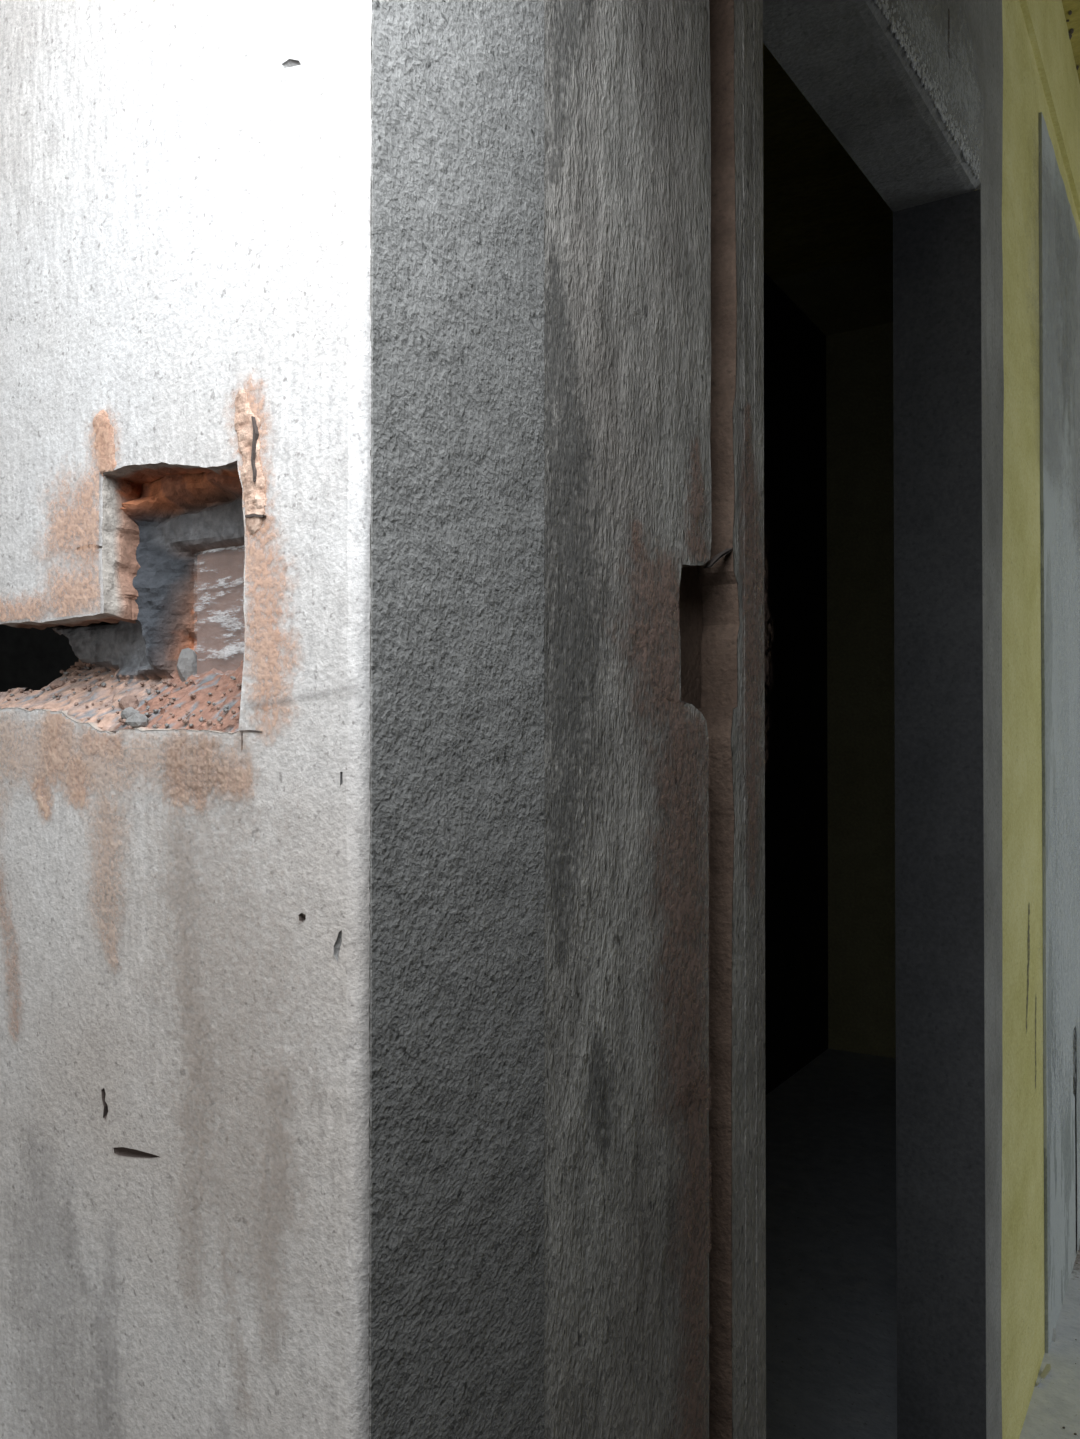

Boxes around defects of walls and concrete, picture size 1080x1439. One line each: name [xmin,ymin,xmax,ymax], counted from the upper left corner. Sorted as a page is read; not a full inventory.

rust [238,379,267,507]
rust [245,522,295,733]